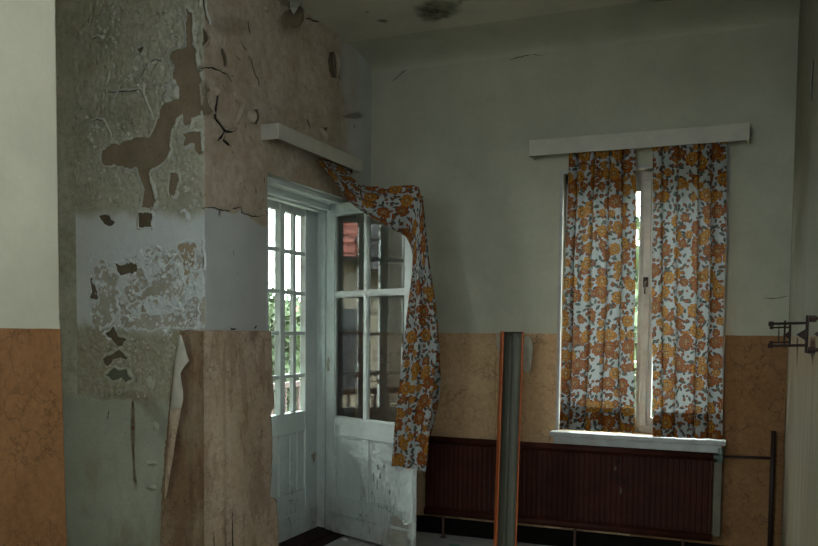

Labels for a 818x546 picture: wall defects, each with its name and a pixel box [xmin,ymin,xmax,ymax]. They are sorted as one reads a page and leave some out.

spalling [86,0,216,230]
crack [198,0,212,25]
crack [198,21,260,146]
peeling [87,238,203,385]